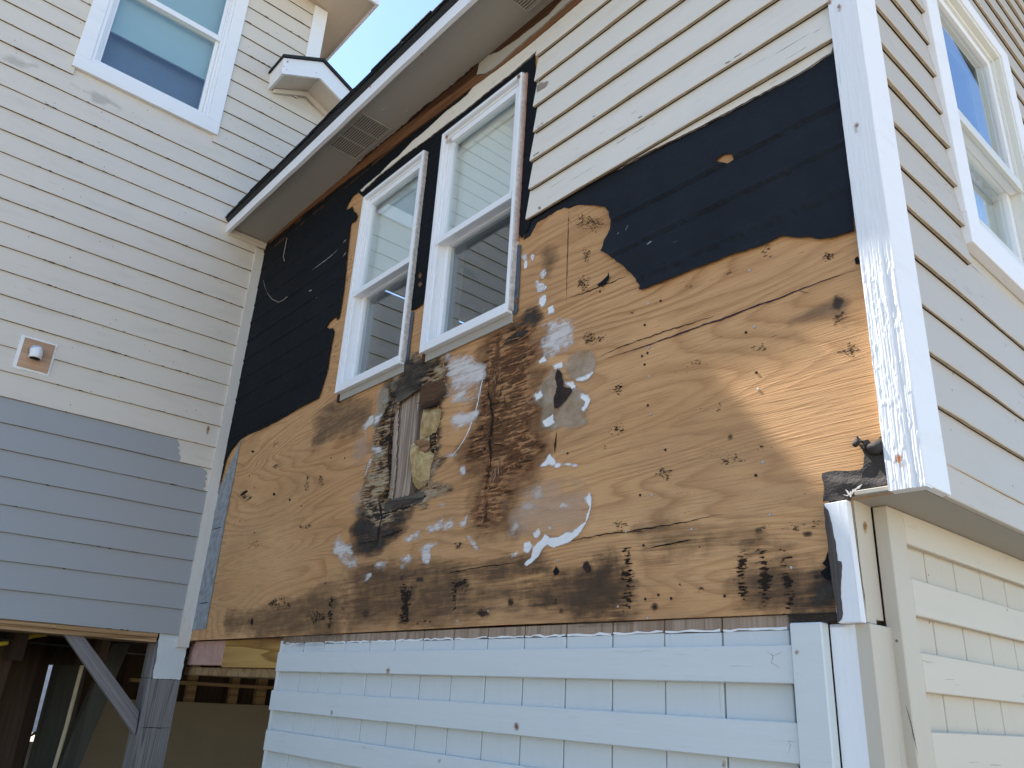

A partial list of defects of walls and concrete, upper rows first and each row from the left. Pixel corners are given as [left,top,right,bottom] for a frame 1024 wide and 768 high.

crack [600,268,860,358]
damp [387,359,436,394]
damp [451,261,563,550]
damp [226,595,337,636]
damp [342,504,542,625]
damp [534,547,635,612]
crack [572,514,722,549]
damp [734,549,837,621]